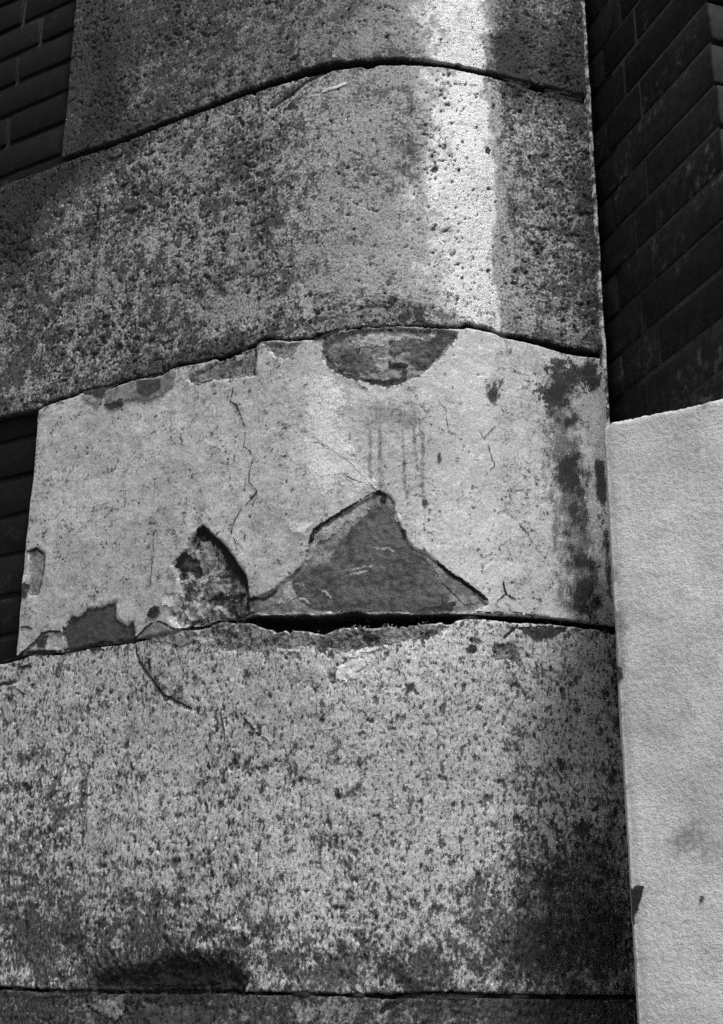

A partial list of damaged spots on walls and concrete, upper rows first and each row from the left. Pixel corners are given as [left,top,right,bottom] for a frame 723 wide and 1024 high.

spalling [296,294,458,387]
damp [485,376,505,402]
crack [180,387,258,544]
damp [525,353,612,625]
crack [135,643,269,783]
spalling [2,490,489,687]
spalling [492,642,522,666]
spalling [523,625,565,639]